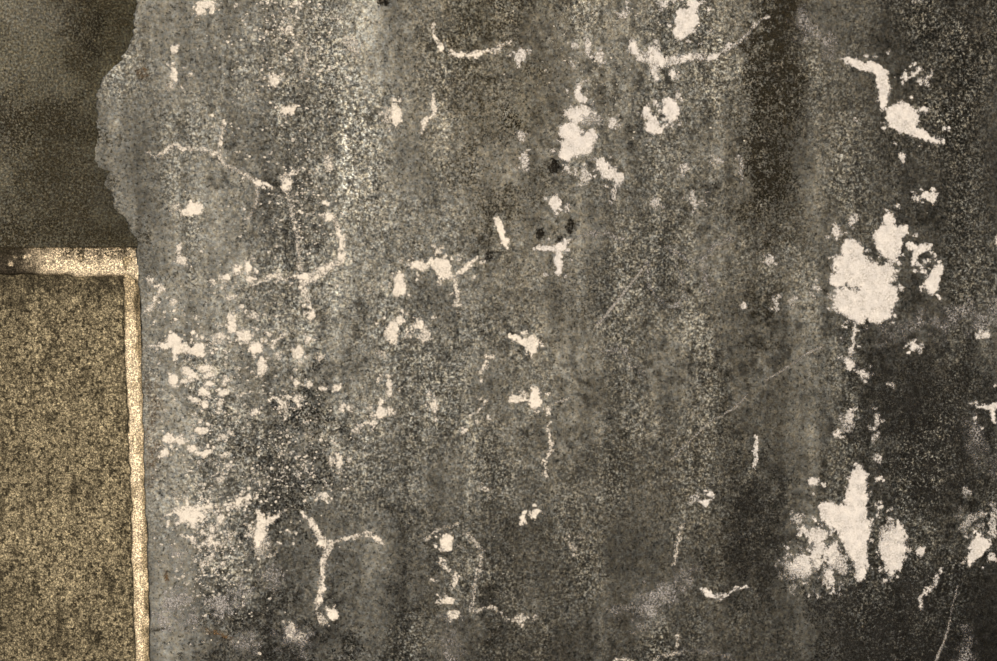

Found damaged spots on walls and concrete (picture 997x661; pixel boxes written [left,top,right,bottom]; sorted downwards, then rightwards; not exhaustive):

leakage [0,0,150,261]
leakage [256,164,303,227]
leakage [237,358,352,554]
leakage [811,298,997,522]
leakage [178,574,364,661]
crack [300,511,383,610]
leakage [387,541,421,637]
leakage [613,549,717,627]
leakage [711,467,997,661]
crack [918,567,942,607]